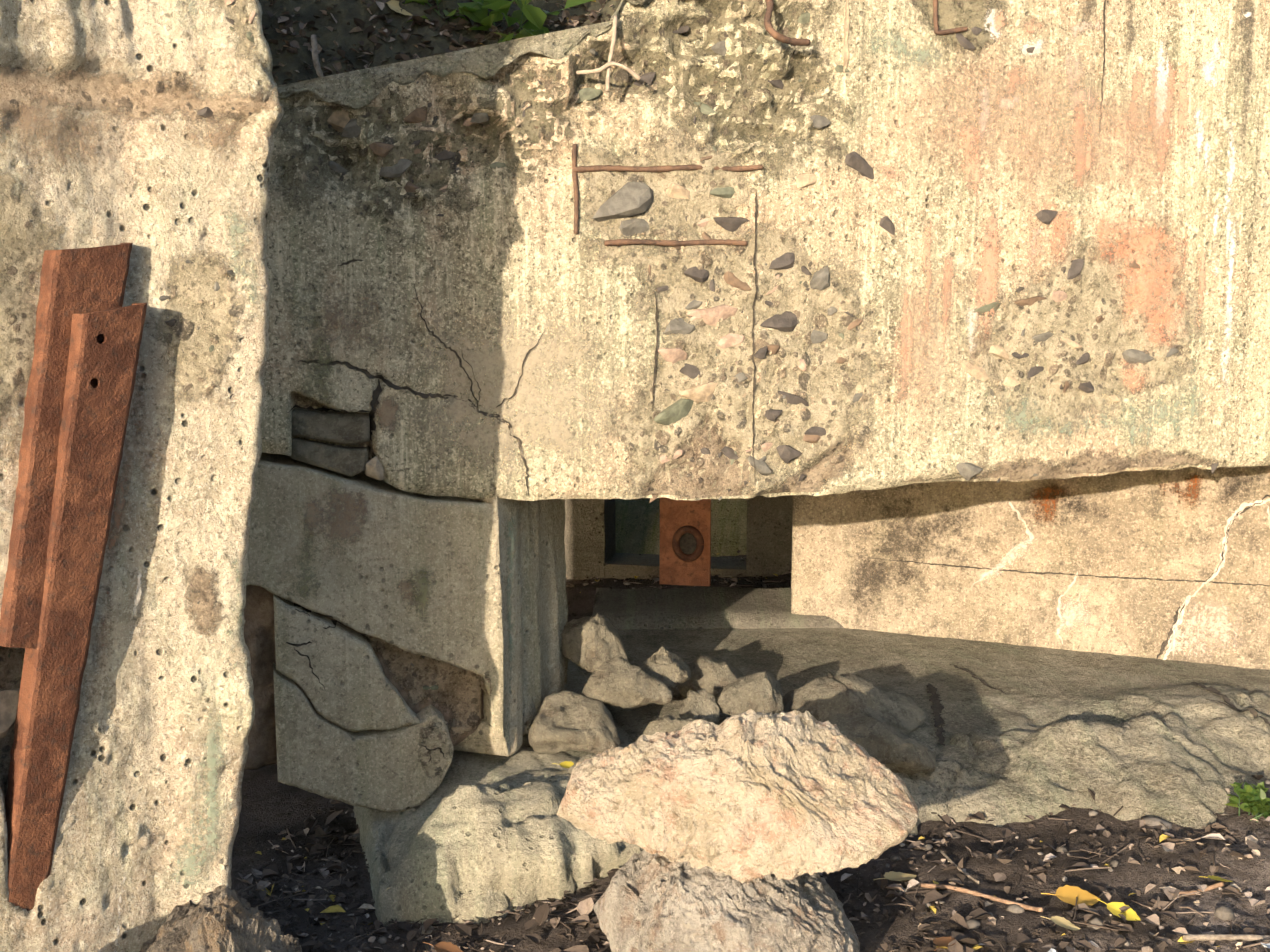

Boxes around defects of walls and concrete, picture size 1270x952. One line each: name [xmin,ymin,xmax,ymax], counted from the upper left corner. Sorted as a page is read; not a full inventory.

spalling [912,0,1006,53]
spalling [1020,39,1044,57]
spalling [0,0,888,503]
spalling [879,216,895,235]
crack [288,287,545,496]
crack [1157,494,1270,660]
crack [286,599,348,689]
crack [1190,682,1270,726]